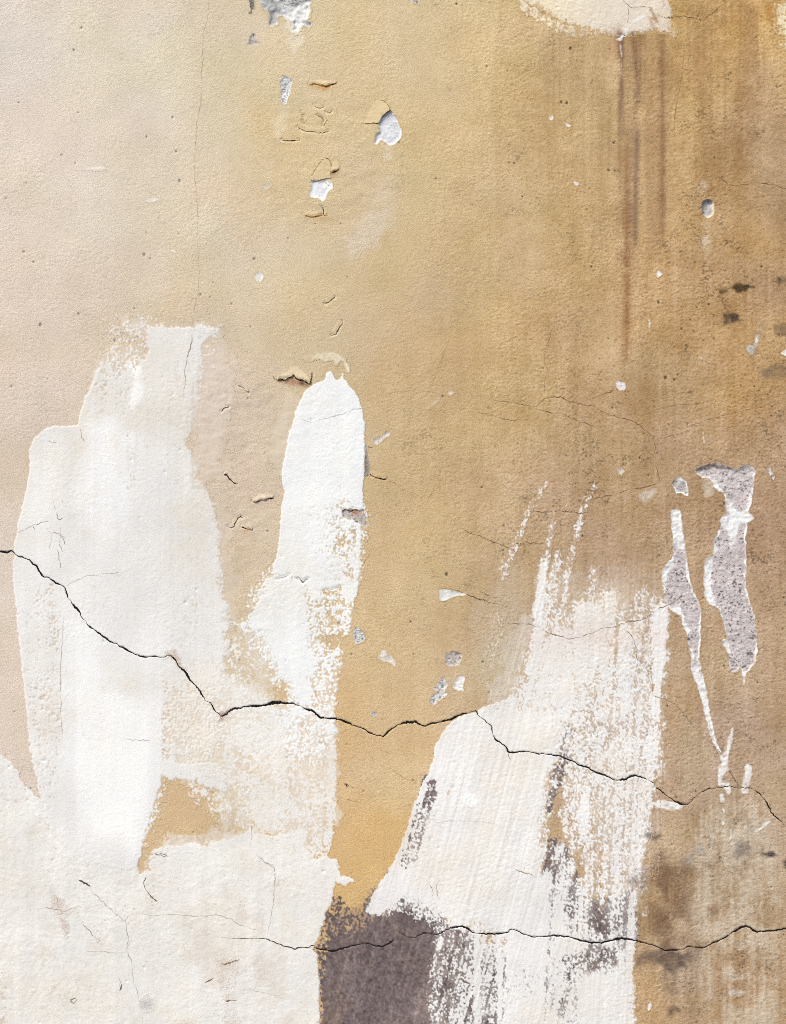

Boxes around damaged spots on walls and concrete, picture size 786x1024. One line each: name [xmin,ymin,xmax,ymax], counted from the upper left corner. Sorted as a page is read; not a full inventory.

spalling [245,0,312,47]
spalling [278,75,293,106]
peeling [306,79,338,93]
peeling [365,99,402,146]
spalling [301,158,341,223]
water stain [499,0,786,366]
peeling [273,365,313,390]
spalling [671,475,717,500]
crack [0,492,783,823]
spalling [429,650,466,706]
crack [46,826,786,1019]